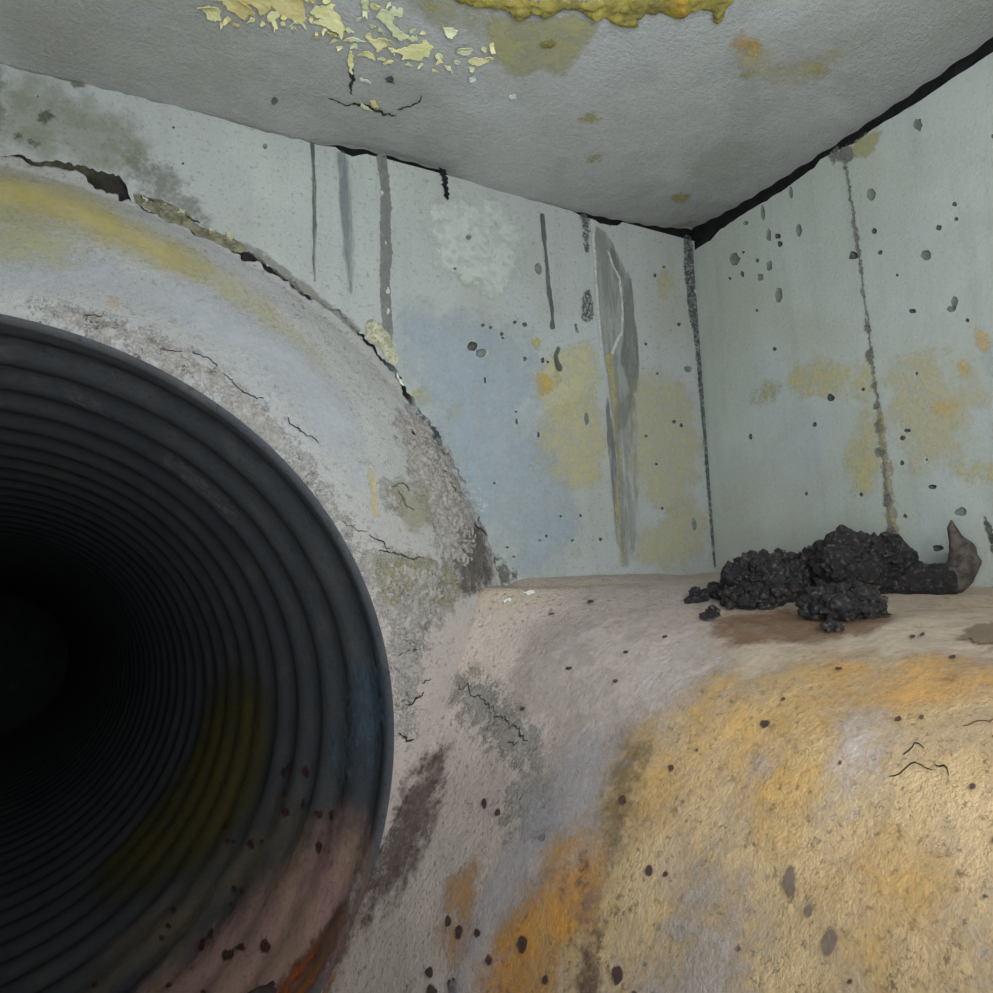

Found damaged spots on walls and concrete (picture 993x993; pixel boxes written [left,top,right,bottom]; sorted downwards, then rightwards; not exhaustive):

peeling [197,0,496,84]
crack [328,69,422,117]
crack [4,154,200,235]
water stain [338,154,349,269]
crack [163,347,263,399]
crack [232,251,466,492]
water stain [364,153,639,593]
crack [459,683,528,746]